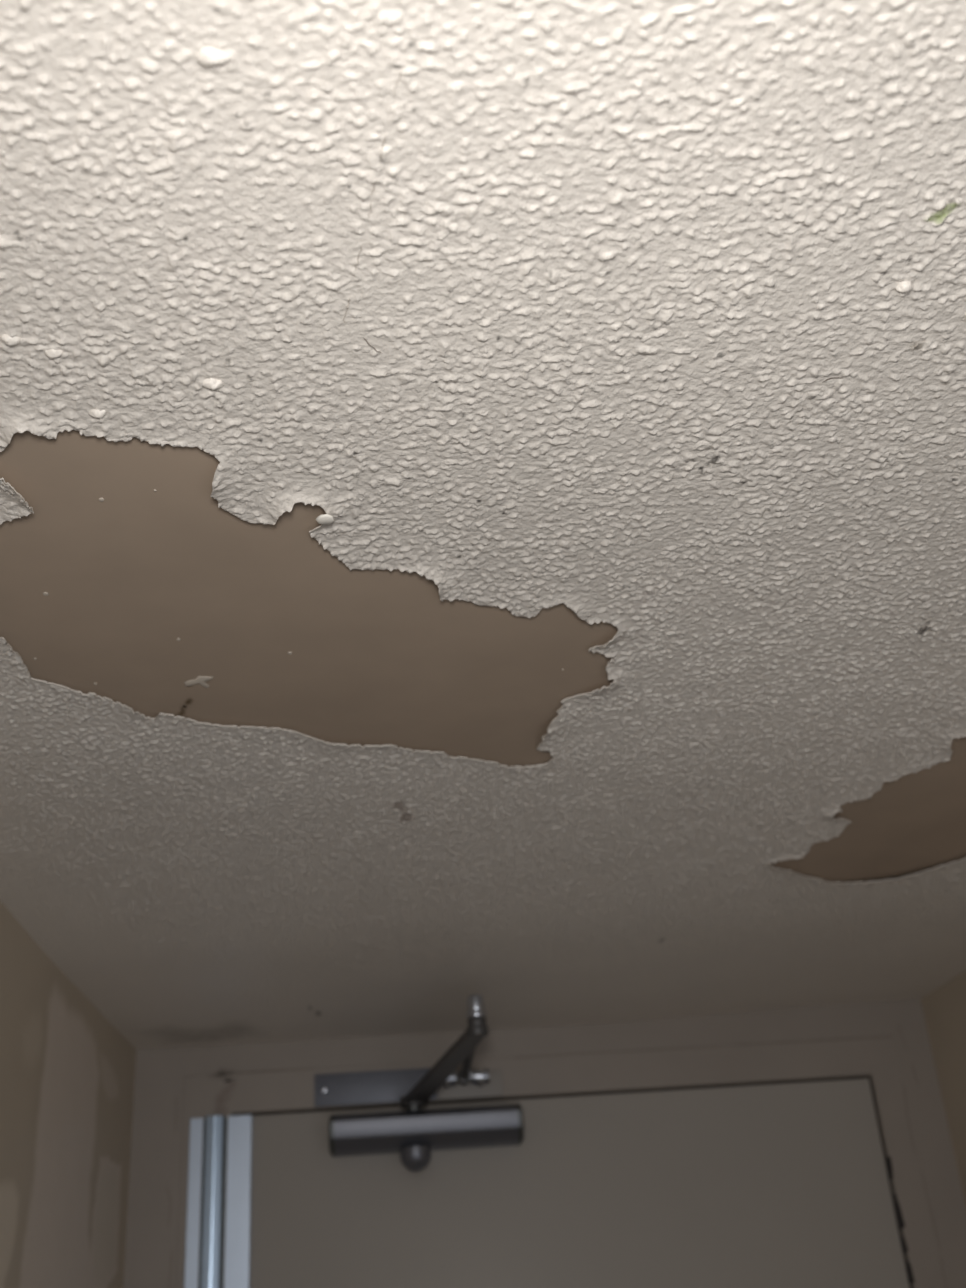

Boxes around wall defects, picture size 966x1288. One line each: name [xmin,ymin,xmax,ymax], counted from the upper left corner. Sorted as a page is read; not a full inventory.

peeling [0,430,618,767]
peeling [770,737,966,883]